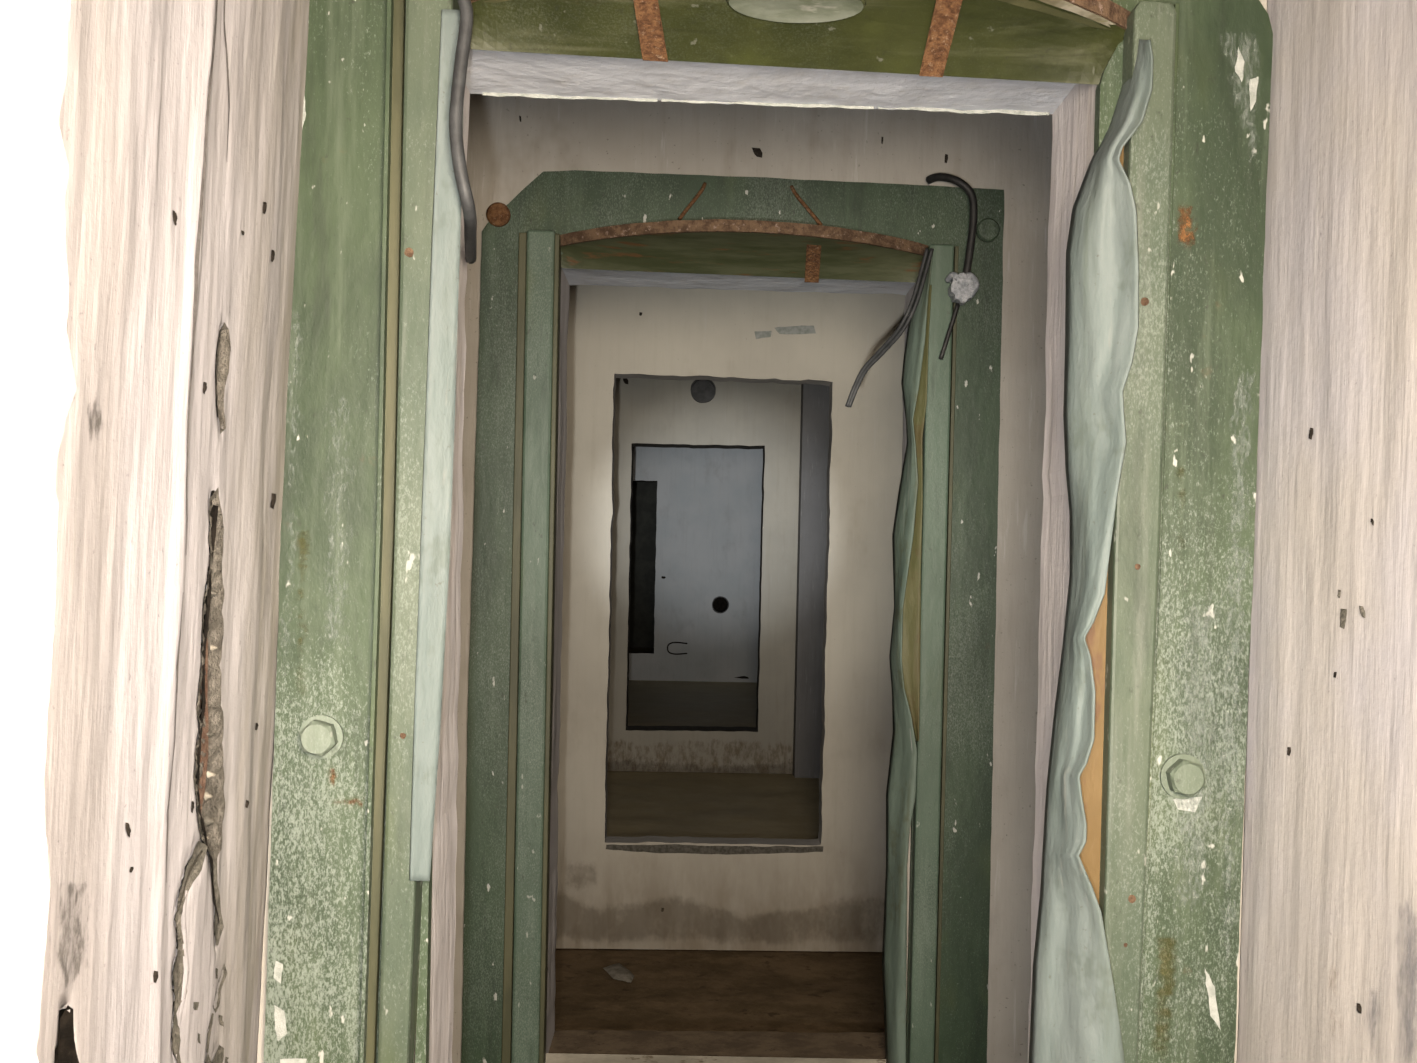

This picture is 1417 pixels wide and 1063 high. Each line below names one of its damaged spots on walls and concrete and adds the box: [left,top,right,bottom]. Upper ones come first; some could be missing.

spalling [215,322,231,434]